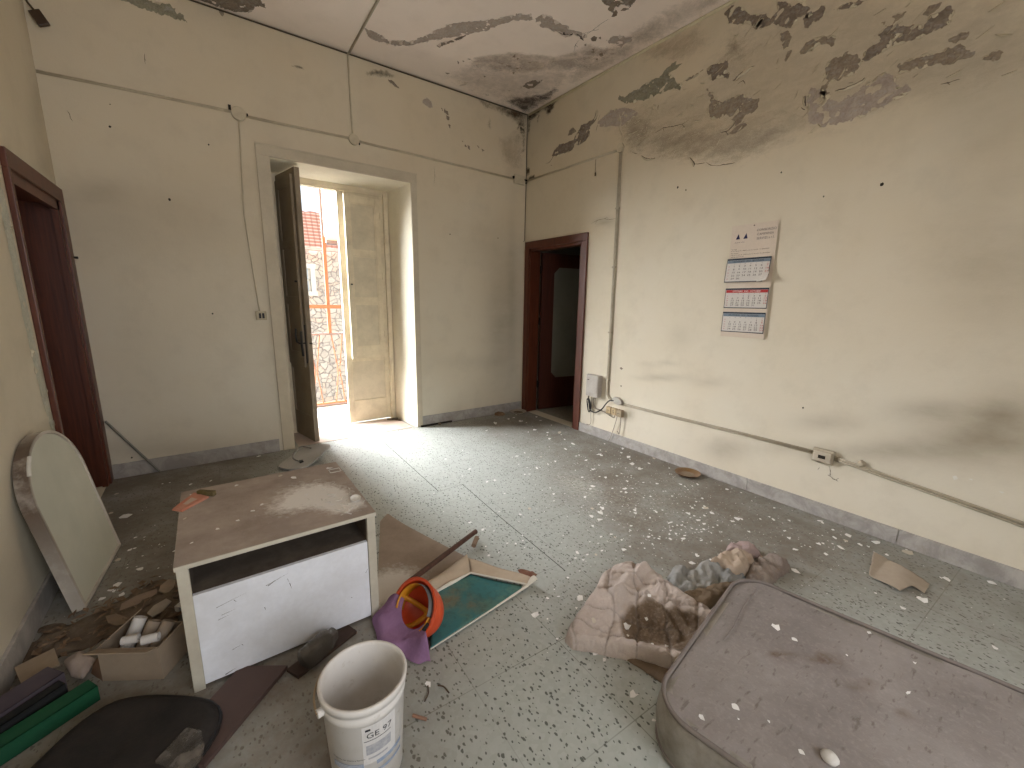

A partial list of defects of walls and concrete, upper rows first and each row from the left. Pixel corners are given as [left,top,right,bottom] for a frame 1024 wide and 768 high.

peeling [121,0,187,22]
peeling [201,0,265,17]
peeling [364,13,632,60]
peeling [724,0,1004,127]
damp [498,70,559,132]
peeling [552,60,759,157]